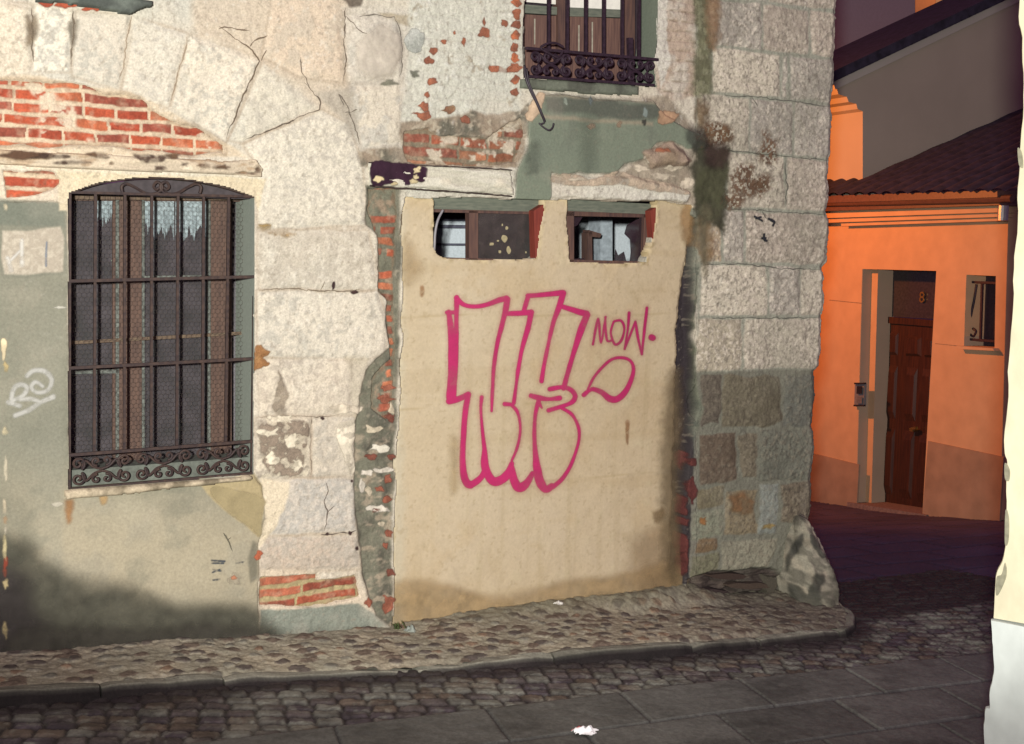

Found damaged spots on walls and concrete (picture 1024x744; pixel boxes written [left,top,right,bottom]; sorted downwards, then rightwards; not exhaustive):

flaking render [0,80,223,156]